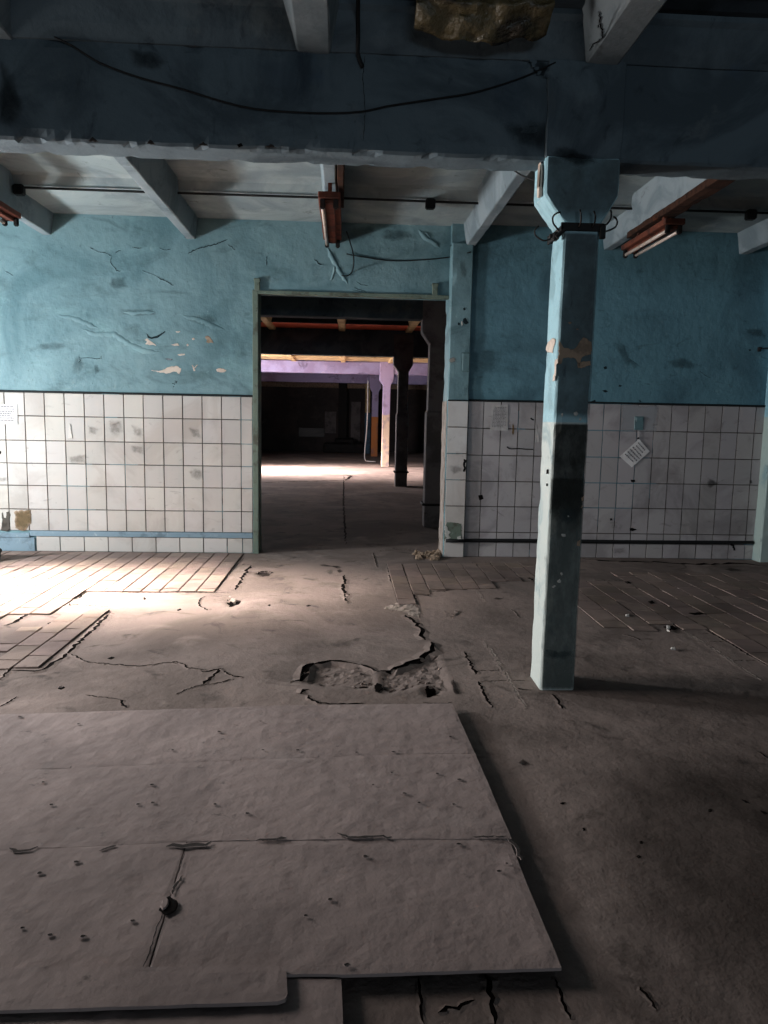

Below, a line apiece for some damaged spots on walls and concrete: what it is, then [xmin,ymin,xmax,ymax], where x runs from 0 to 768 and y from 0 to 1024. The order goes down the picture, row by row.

crack [587,11,605,51]
crack [90,237,235,286]
peeling [152,336,213,374]
peeling [546,322,592,381]
crack [337,575,354,605]
crack [67,653,244,694]
spalling [289,615,459,705]